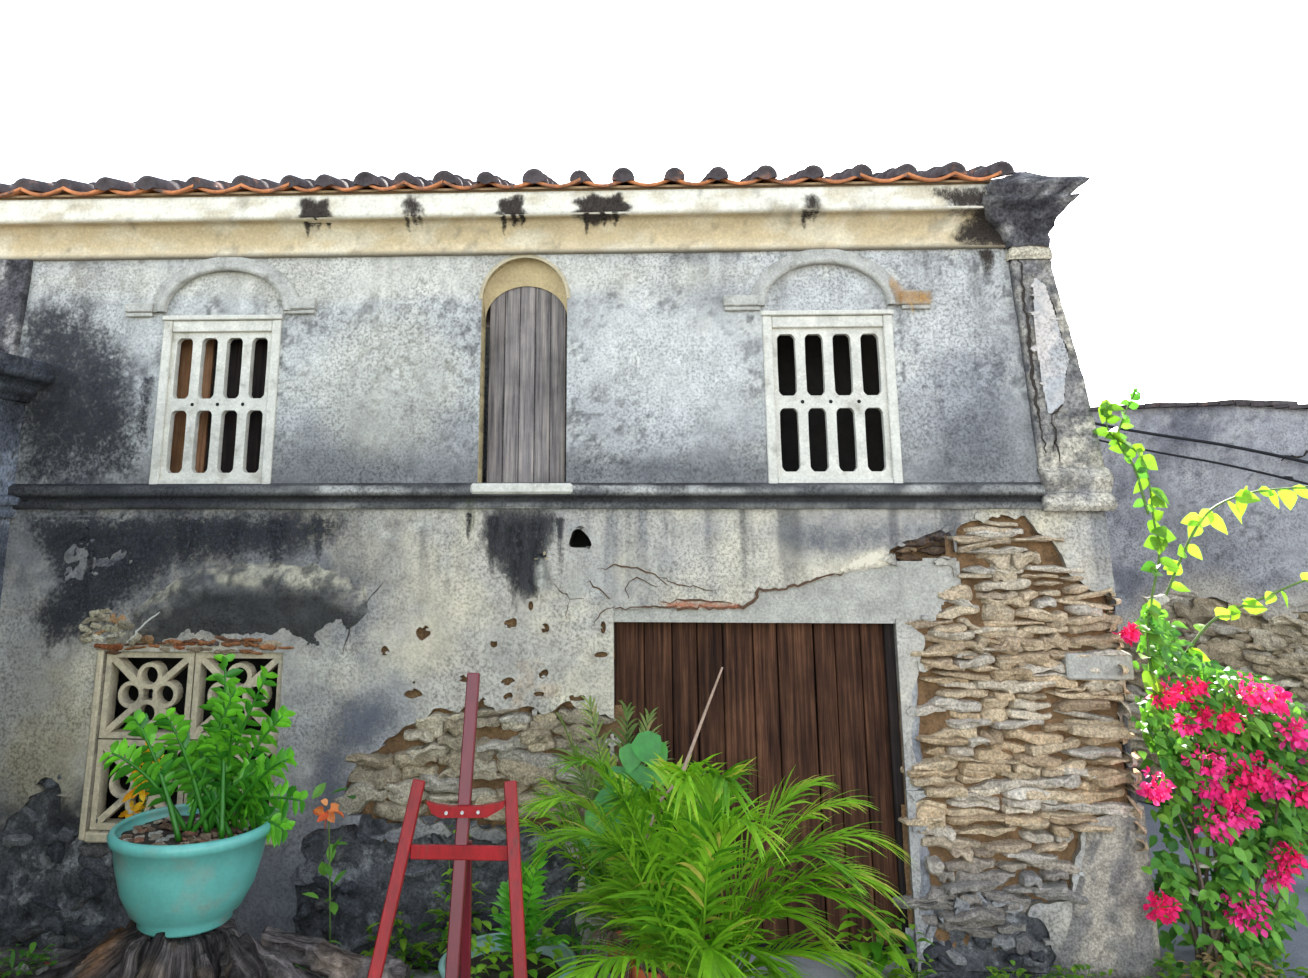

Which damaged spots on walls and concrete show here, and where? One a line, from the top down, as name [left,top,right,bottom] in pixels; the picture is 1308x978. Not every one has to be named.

damp [299,198,331,235]
damp [496,195,526,232]
damp [573,193,632,234]
damp [19,300,154,484]
flaking render [1028,278,1069,415]
damp [27,511,344,654]
damp [466,508,564,599]
flaking render [589,621,615,659]
crack [553,564,870,624]
flaking render [879,512,1308,978]
spalling [0,774,131,950]
flaking render [291,677,626,970]